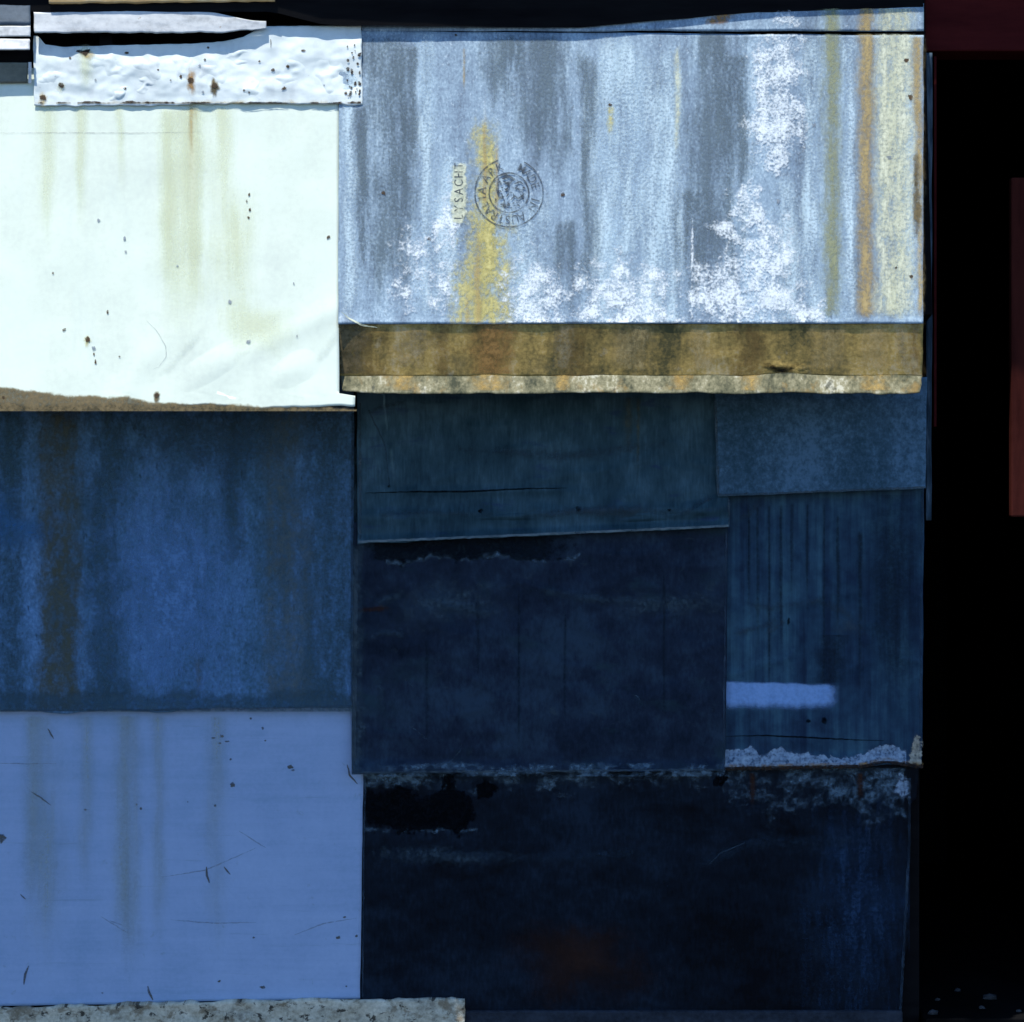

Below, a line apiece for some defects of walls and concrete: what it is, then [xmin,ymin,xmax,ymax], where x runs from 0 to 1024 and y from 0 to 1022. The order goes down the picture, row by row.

corrosion [69,48,96,81]
corrosion [122,47,219,127]
corrosion [339,8,923,390]
damp [779,44,820,319]
damp [842,45,855,307]
corrosion [0,387,357,411]
peeling [364,763,553,839]
peeling [569,764,611,776]